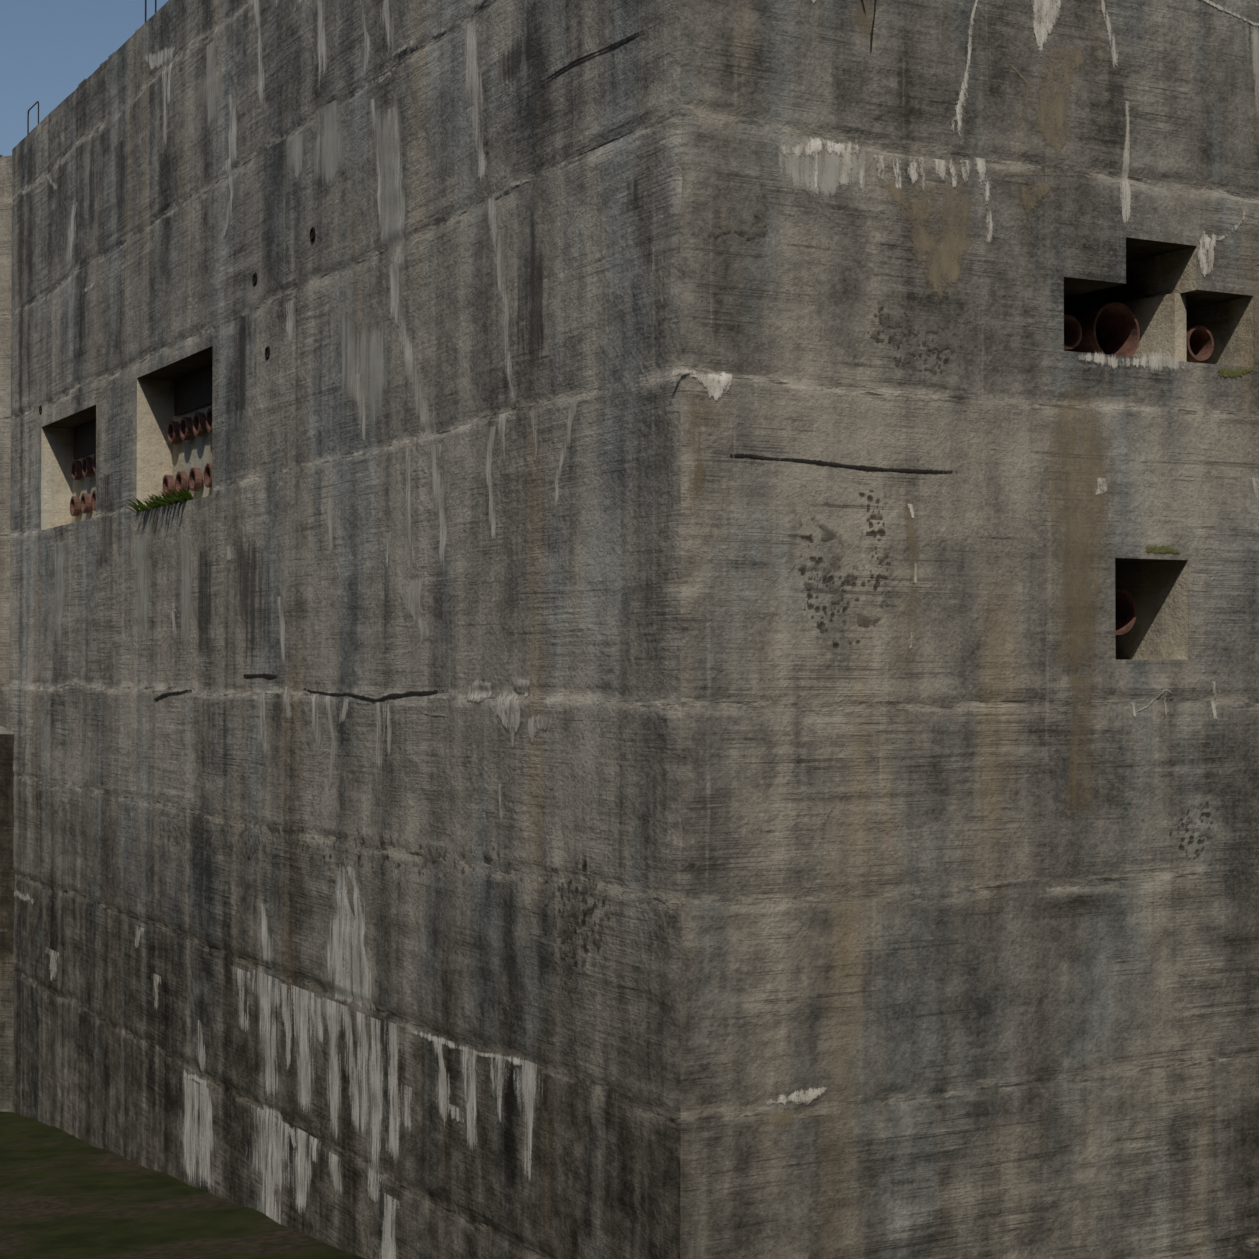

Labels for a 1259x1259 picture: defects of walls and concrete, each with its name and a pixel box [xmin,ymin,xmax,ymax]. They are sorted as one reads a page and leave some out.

leakage [465,0,487,182]
crack [538,30,643,83]
crack [861,0,876,52]
leakage [952,0,978,136]
leakage [1204,0,1259,112]
leakage [777,137,994,243]
leakage [484,179,543,542]
crack [727,453,958,473]
crack [153,689,192,701]
crack [243,673,448,702]
leakage [178,1020,217,1189]
leakage [233,855,543,1259]